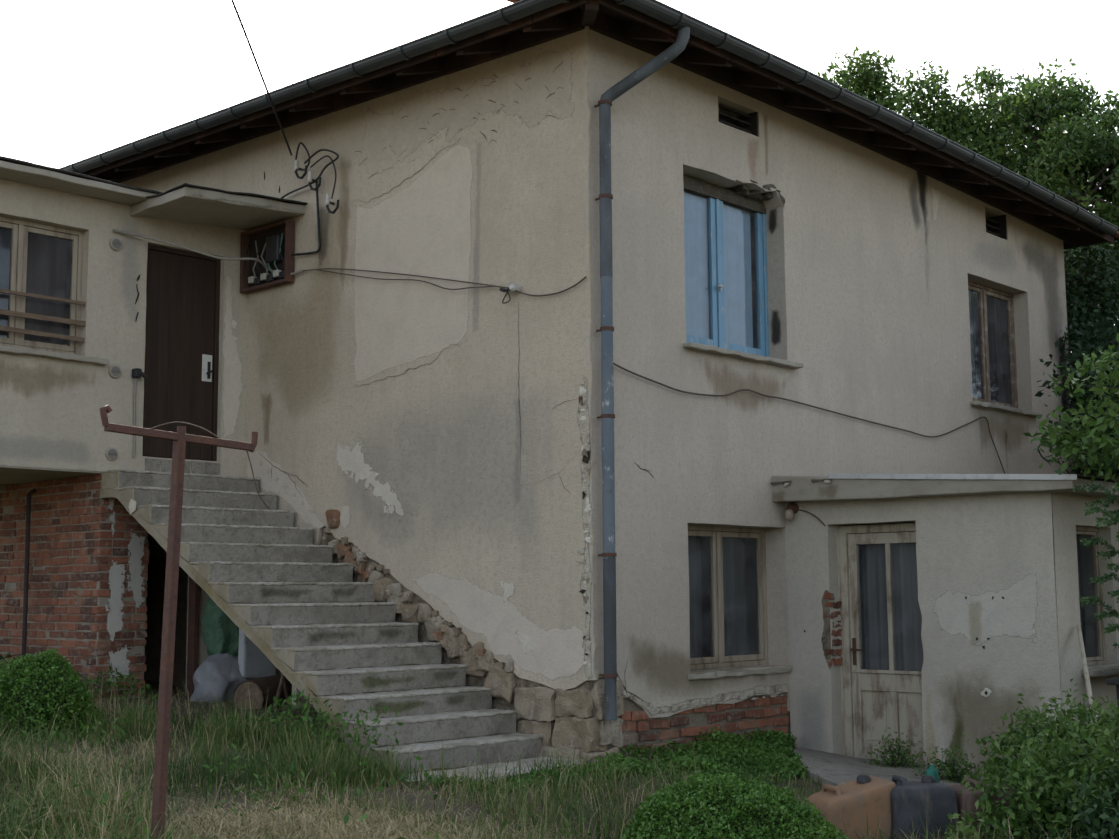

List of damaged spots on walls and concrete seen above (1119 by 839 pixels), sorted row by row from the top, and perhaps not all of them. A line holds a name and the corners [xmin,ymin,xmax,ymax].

leakage [918,172,941,221]
crack [361,340,468,386]
peeling [336,441,408,520]
peeling [411,377,592,680]
peeling [105,498,145,682]
flaking render [821,590,843,669]
spalling [623,684,789,716]